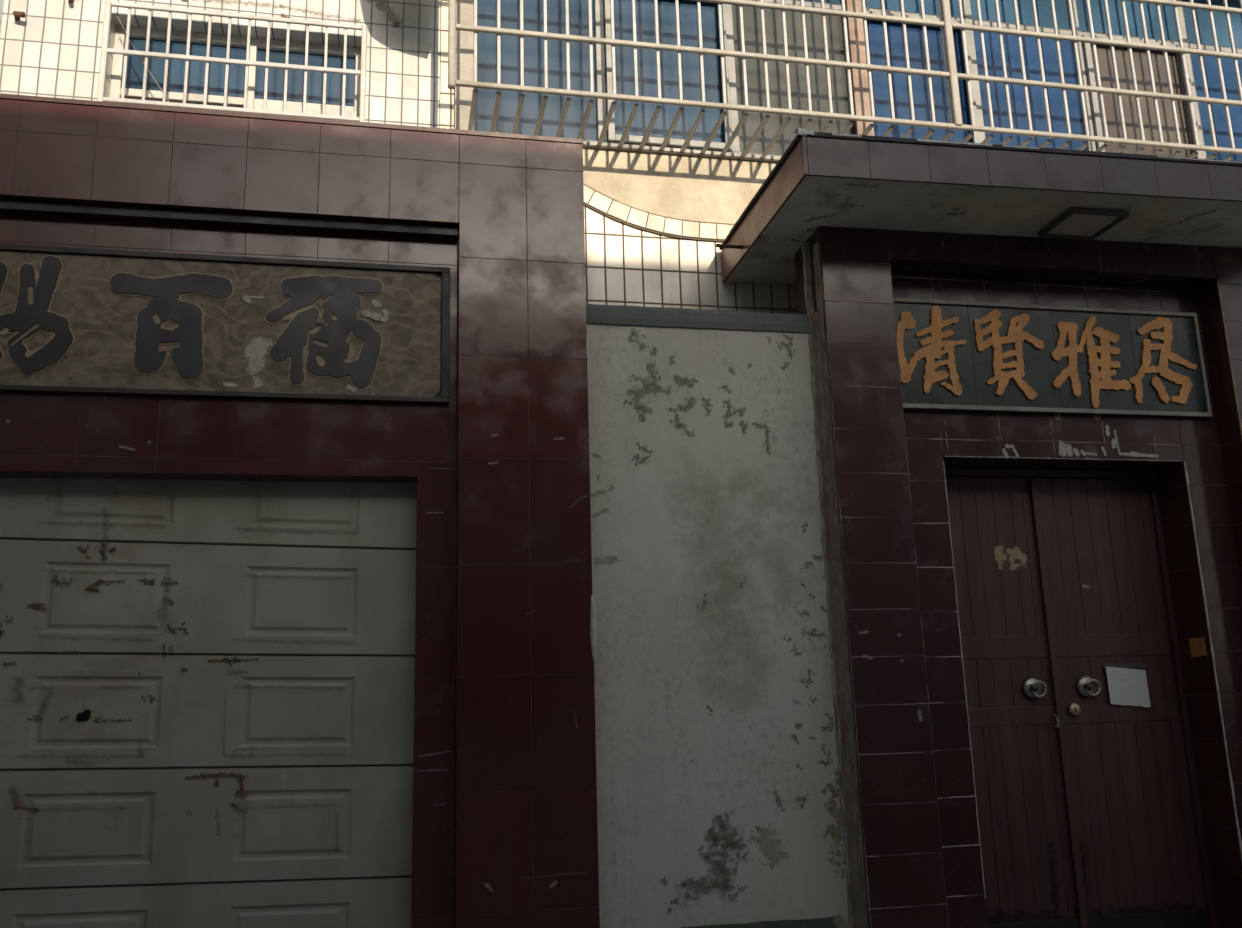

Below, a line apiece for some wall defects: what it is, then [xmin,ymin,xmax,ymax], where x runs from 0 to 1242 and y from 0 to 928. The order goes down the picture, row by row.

peeling [362,299,389,322]
peeling [243,336,274,388]
peeling [624,329,771,454]
peeling [631,442,652,466]
spalling [1059,415,1159,458]
corrosion [85,577,178,606]
corrosion [186,772,249,836]
peeling [773,713,846,878]
flaking render [661,812,788,911]